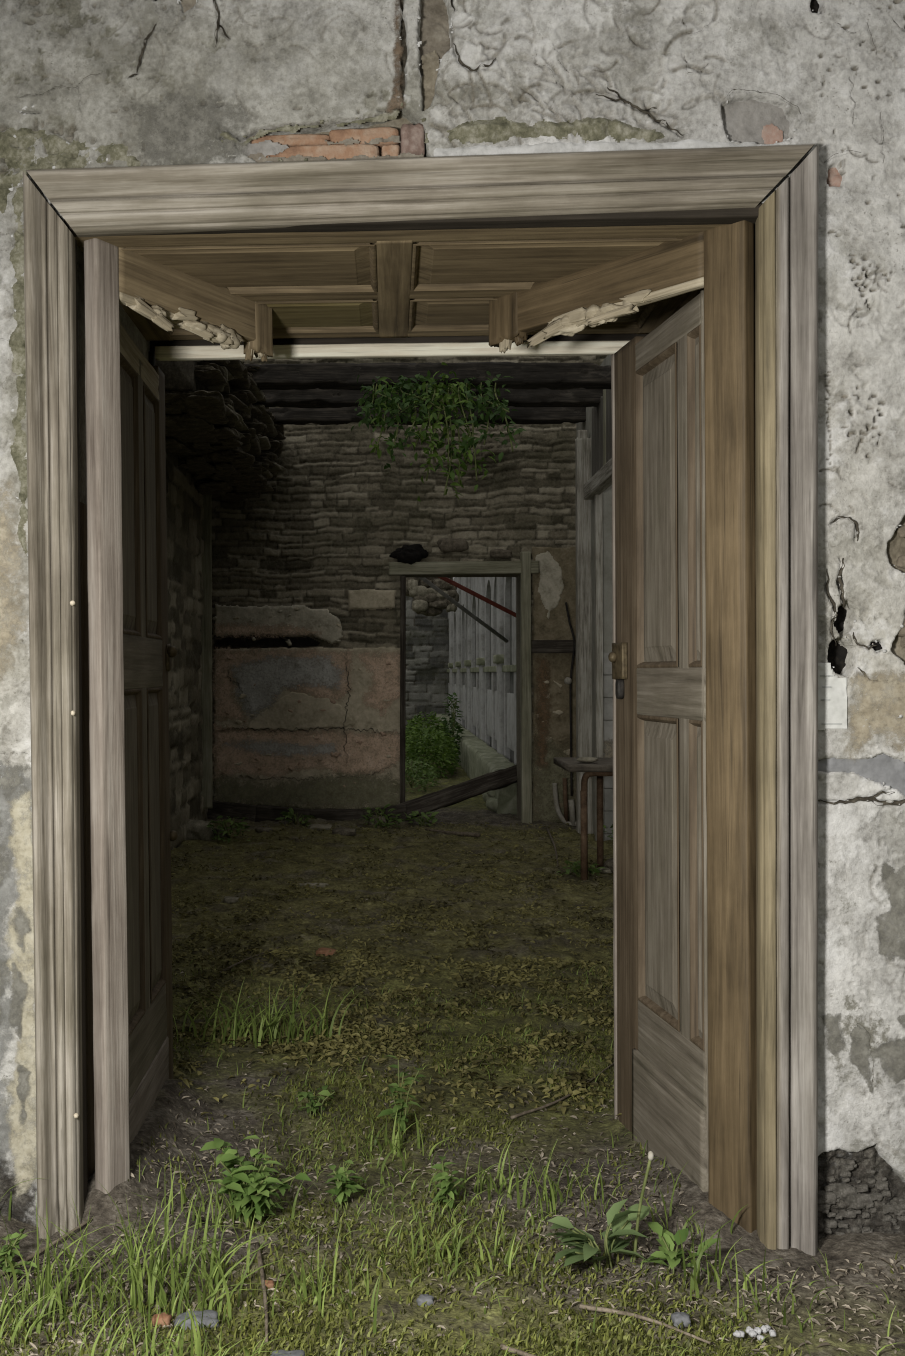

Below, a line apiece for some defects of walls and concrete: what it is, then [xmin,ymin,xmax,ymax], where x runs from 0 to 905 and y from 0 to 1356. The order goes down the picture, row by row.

crack [453,43,496,71]
flaking render [217,95,429,163]
crack [596,87,683,136]
spalling [827,576,856,674]
crack [818,791,905,806]